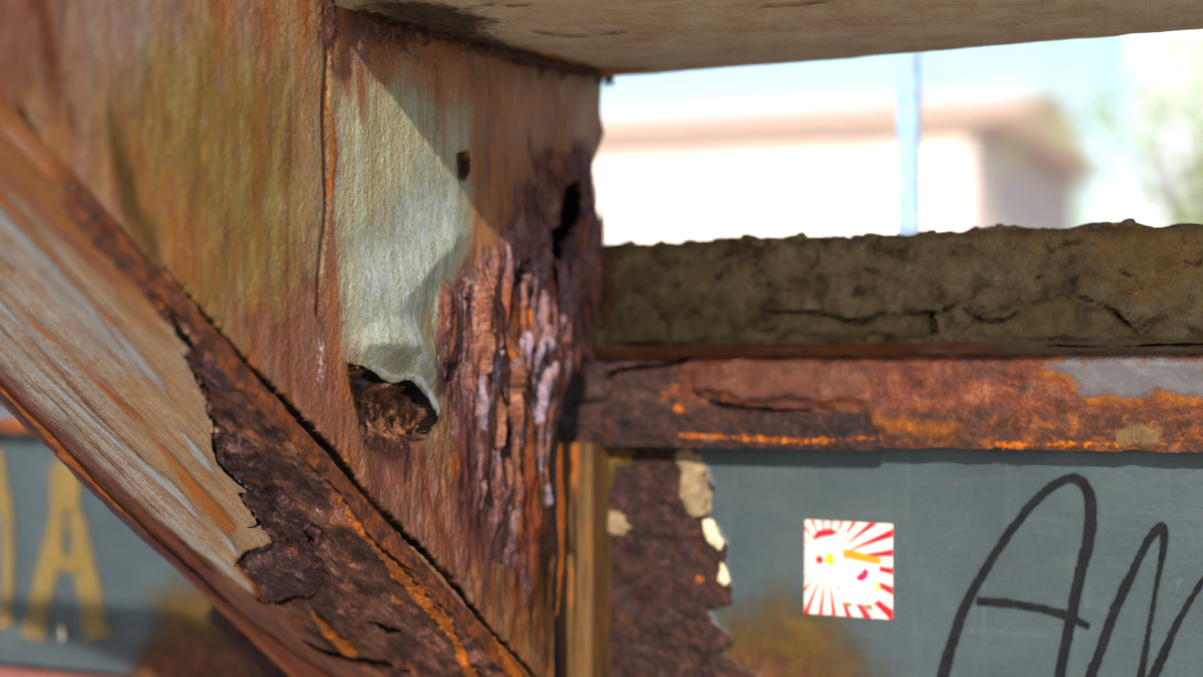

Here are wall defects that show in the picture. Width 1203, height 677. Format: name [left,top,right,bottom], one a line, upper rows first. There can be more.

crack [18,105,33,129]
corrosion [316,0,340,235]
corrosion [357,9,648,89]
corrosion [0,285,235,535]
corrosion [0,361,328,677]
peeling [148,291,506,677]
corrosion [311,610,359,658]
crack [160,270,536,677]
corrosion [325,484,480,677]
corrosion [356,136,606,653]
corrosion [495,642,524,677]
corrosion [989,440,1132,450]